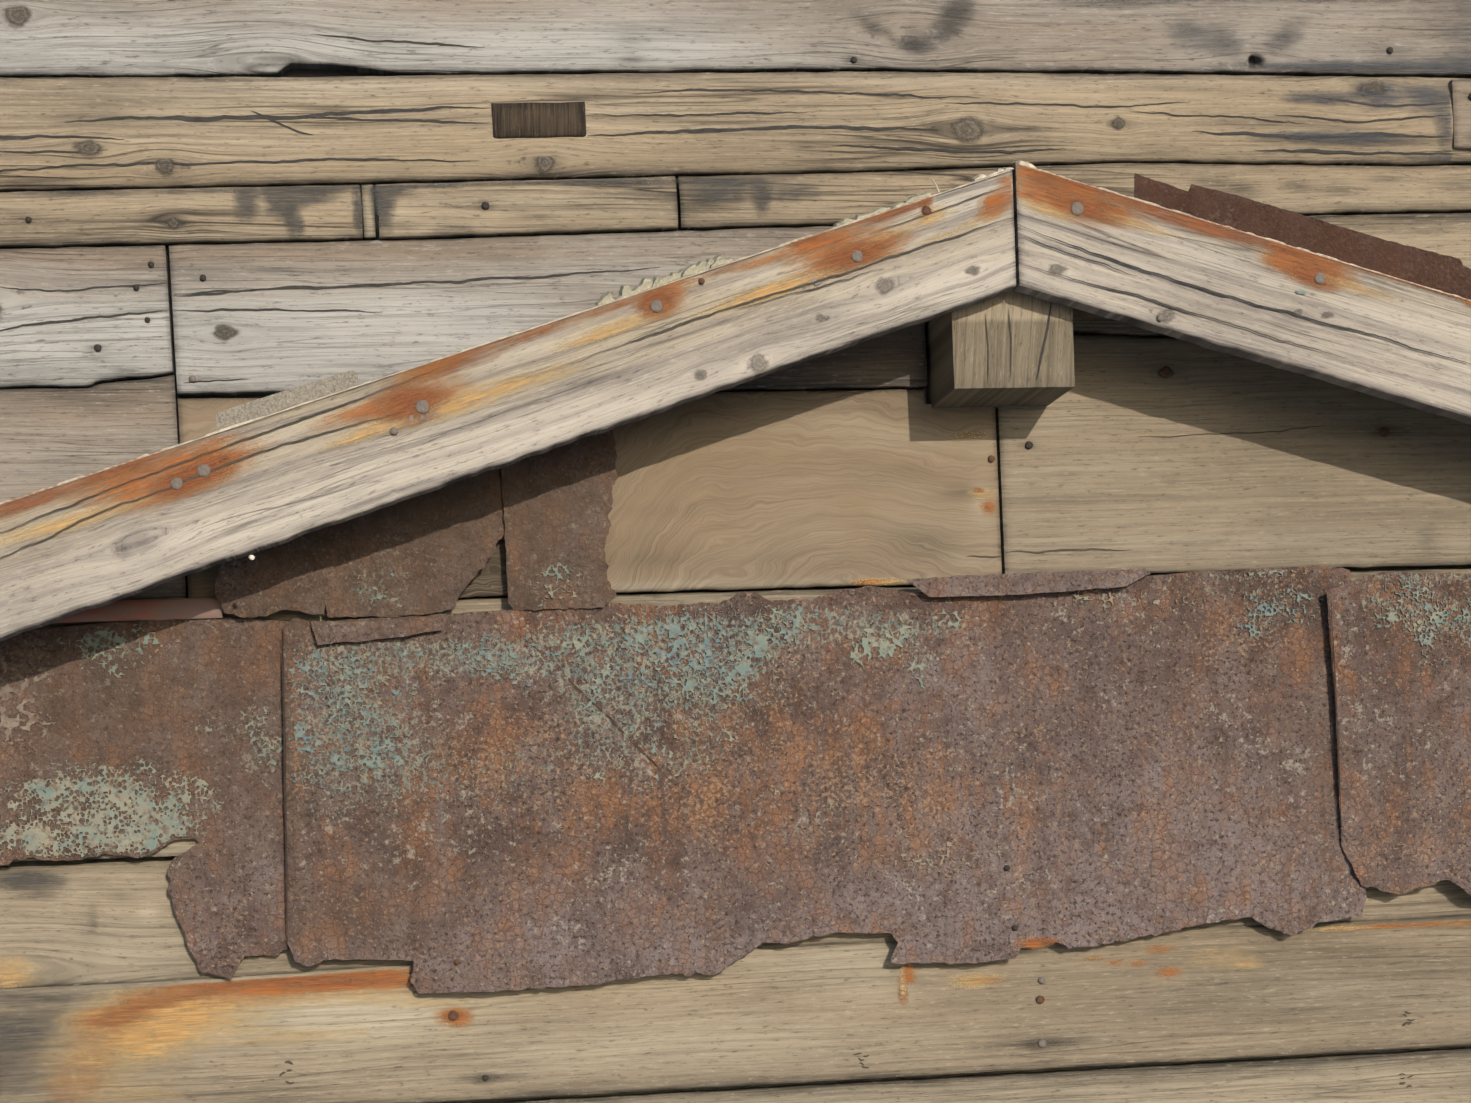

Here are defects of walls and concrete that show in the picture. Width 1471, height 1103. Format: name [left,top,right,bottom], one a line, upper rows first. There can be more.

rust [715,198,948,311]
rust [970,166,1471,305]
rust [565,280,687,346]
rust [328,321,568,444]
rust [0,437,250,538]
rust [66,970,414,1083]